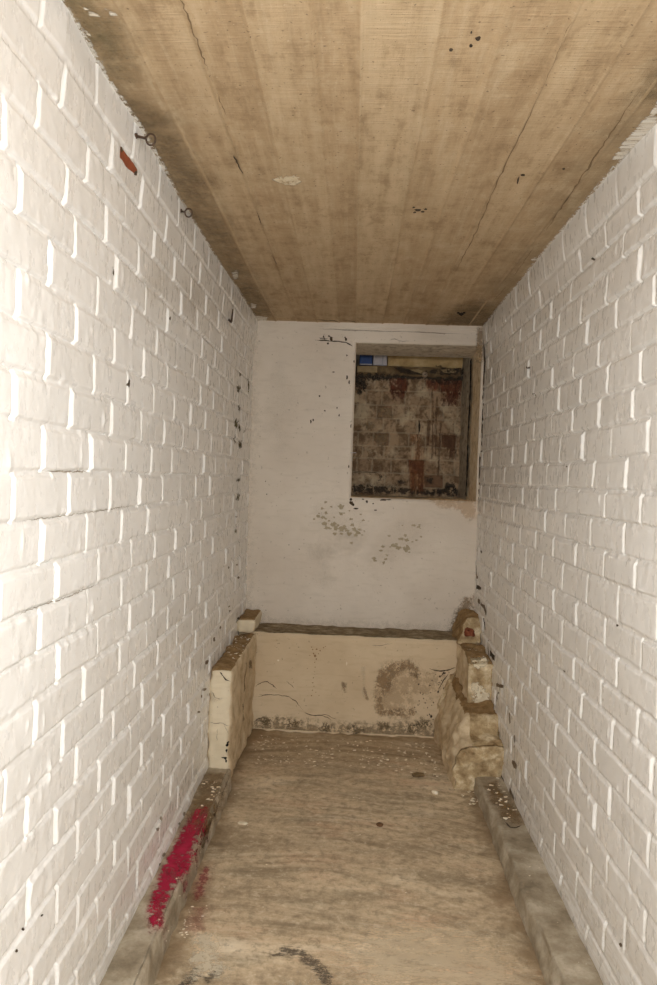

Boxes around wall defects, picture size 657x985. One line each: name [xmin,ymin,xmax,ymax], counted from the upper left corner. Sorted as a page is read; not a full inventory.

rust [408,434,425,494]
peeling [313,498,391,544]
water stain [243,661,446,737]